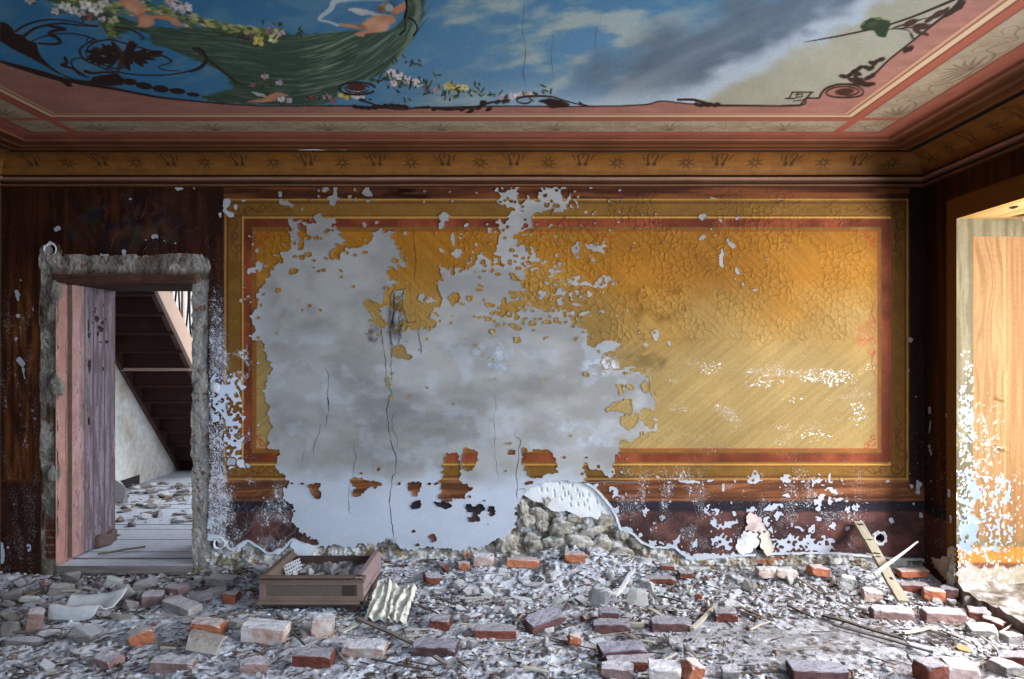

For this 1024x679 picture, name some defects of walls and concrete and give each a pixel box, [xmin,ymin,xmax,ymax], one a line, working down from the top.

crack [348,330,398,537]
crack [489,396,526,499]
peeling [9,187,1015,587]
peeling [1,540,11,566]